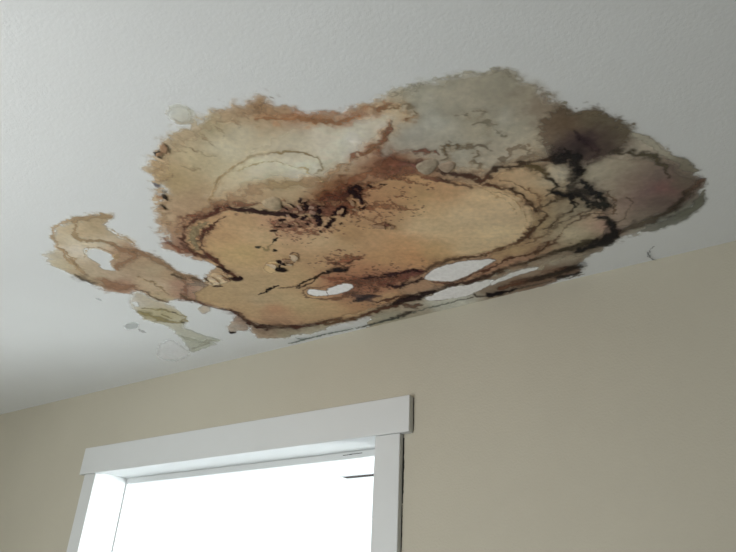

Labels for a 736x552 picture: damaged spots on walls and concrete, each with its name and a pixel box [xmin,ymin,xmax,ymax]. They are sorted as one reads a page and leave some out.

damp [43,70,706,359]
peeling [302,283,353,301]
peeling [424,259,538,301]